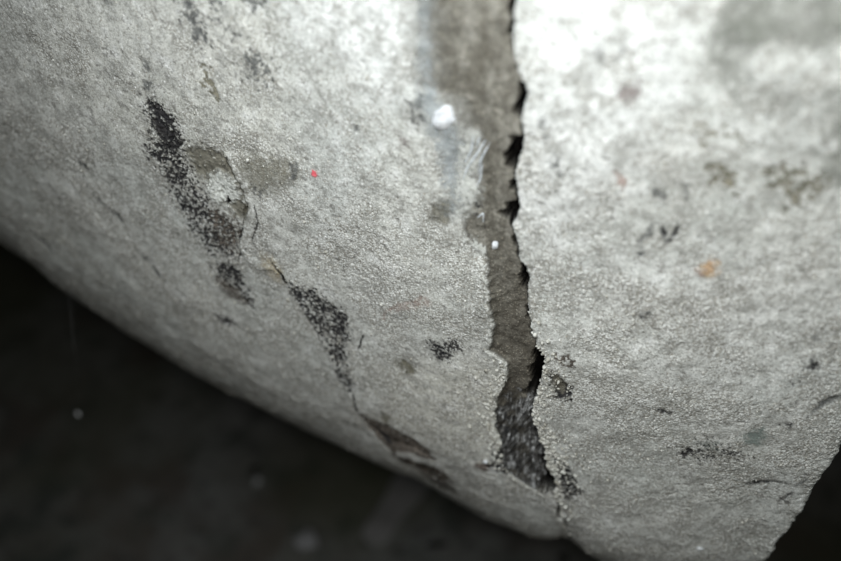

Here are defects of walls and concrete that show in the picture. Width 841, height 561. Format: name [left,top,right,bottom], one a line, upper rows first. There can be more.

crack [509,0,517,48]
crack [227,196,258,256]
spalling [405,0,584,501]
crack [505,81,530,283]
crack [456,311,609,538]